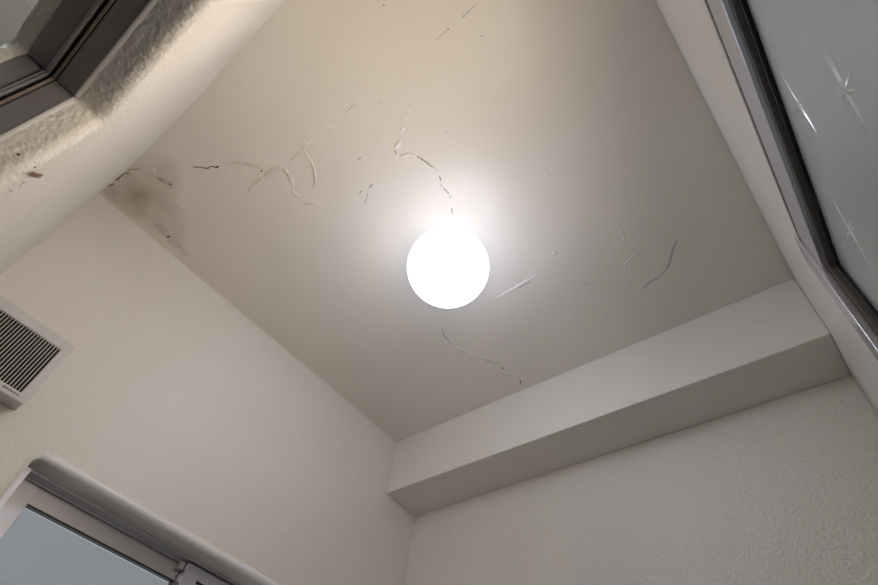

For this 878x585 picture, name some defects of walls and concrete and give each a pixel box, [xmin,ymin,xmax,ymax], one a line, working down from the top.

crack [394,85,452,210]